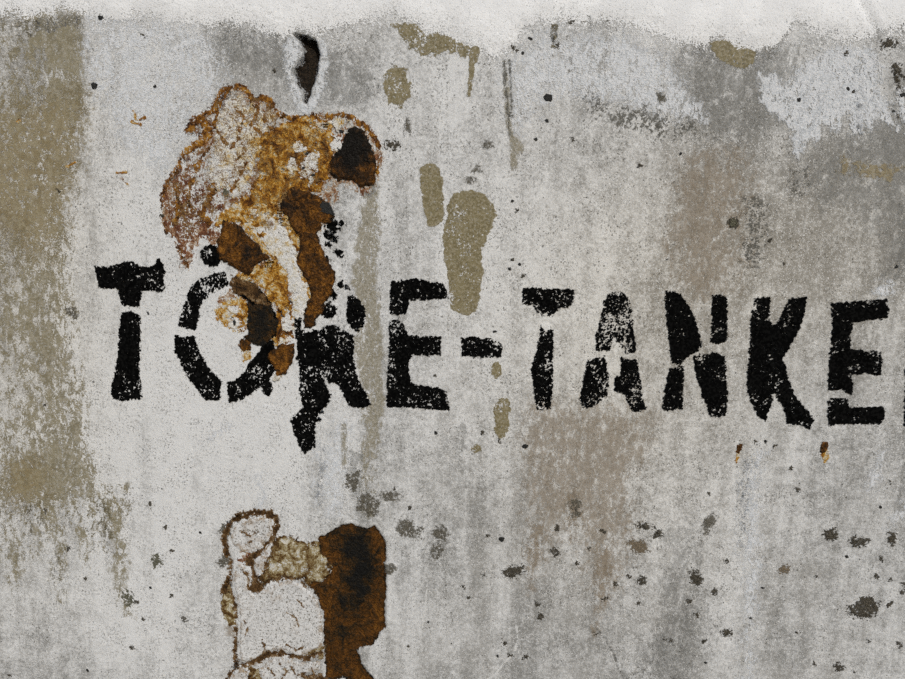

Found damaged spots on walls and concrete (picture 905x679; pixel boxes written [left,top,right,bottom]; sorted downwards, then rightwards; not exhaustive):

water stain [383,65,411,108]
water stain [390,22,480,96]
water stain [0,6,234,617]
corrosion [159,83,385,382]
water stain [420,163,498,316]